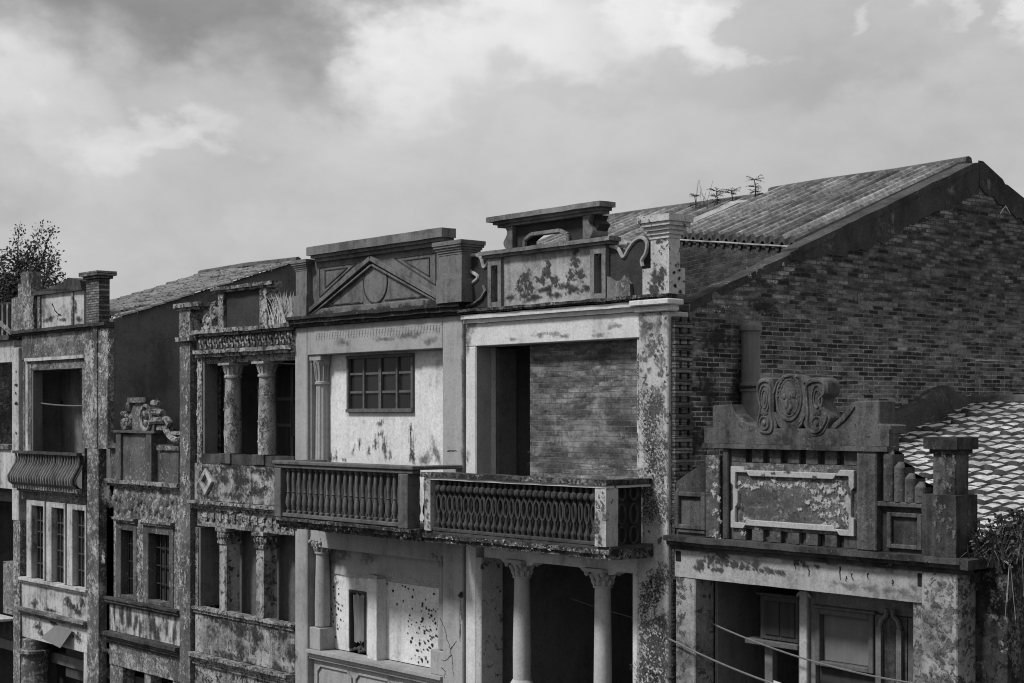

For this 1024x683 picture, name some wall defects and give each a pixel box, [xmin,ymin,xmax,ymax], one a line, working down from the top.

spalling [515,248,586,299]
spalling [646,263,682,297]
damp [330,421,392,460]
peeling [737,470,854,546]
spalling [382,573,439,663]